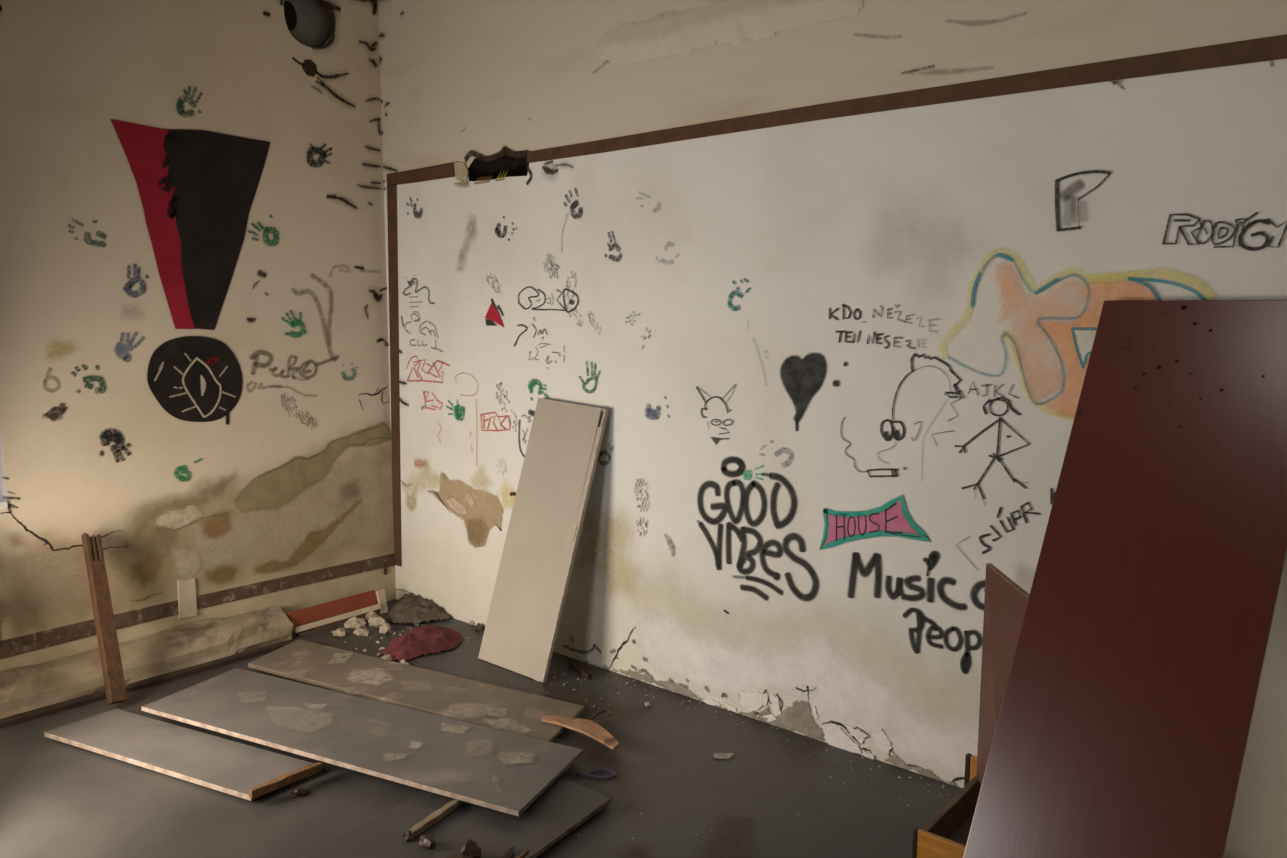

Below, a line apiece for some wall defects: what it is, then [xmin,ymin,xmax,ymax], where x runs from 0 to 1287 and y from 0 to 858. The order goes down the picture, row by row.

spalling [468,150,529,181]
crack [0,504,127,551]
peeling [156,505,203,528]
leakage [104,423,391,608]
peeling [428,473,504,547]
leakage [21,548,90,601]
spalling [563,636,957,787]